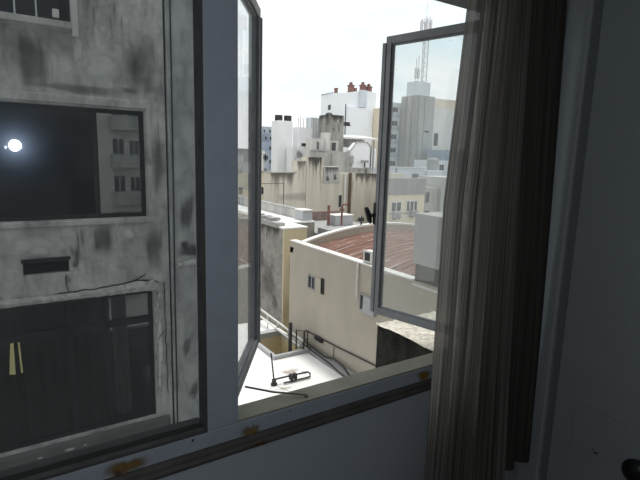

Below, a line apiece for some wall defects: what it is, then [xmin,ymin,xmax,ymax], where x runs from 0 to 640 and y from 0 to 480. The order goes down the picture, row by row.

leakage [298,152,338,181]
crack [54,274,168,388]